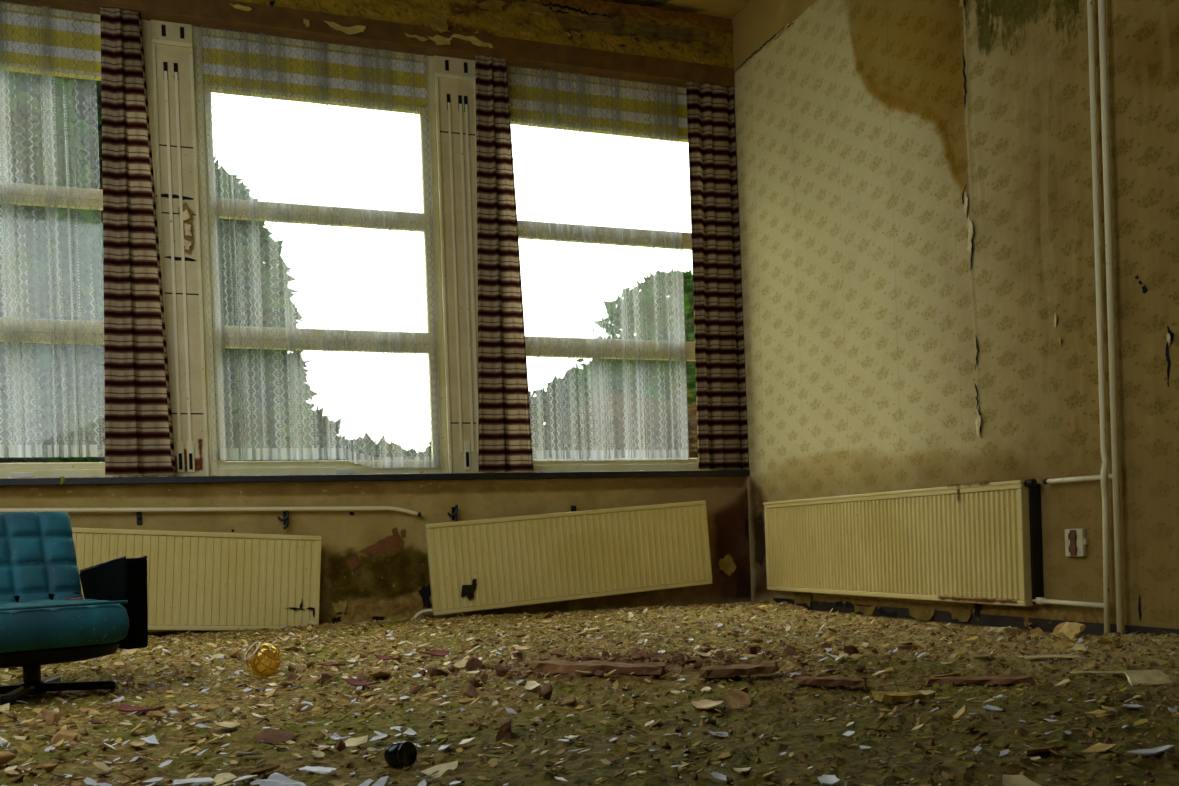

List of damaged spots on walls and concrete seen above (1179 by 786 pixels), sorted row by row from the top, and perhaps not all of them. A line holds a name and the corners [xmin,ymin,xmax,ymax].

peeling [324,21,366,35]
peeling [405,4,496,48]
water stain [965,0,1079,55]
peeling [346,528,406,571]
flaking render [328,584,434,624]